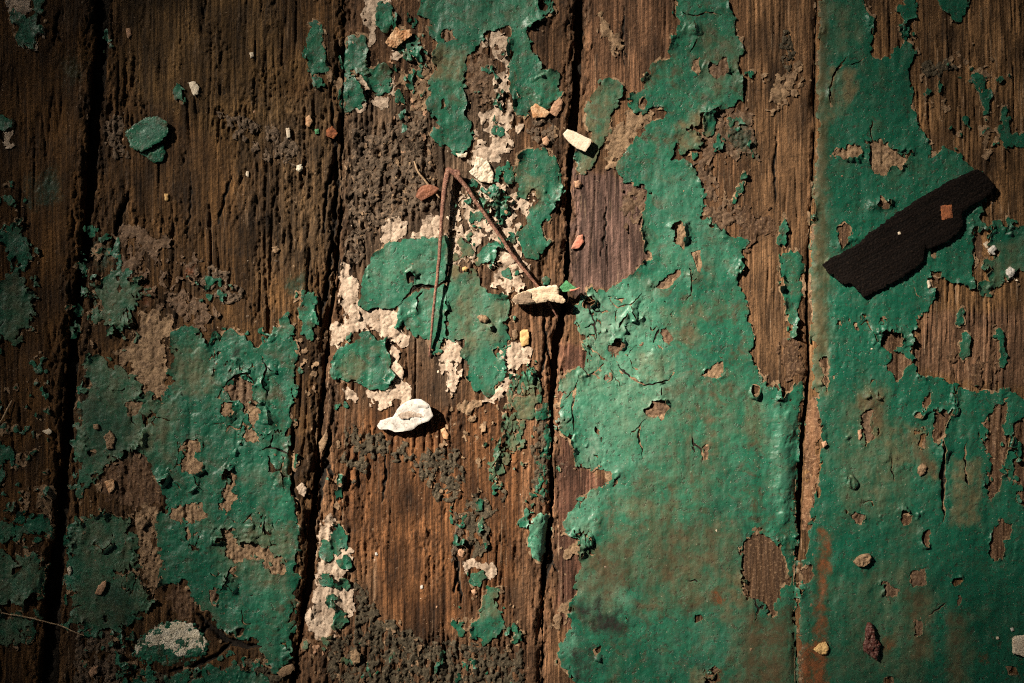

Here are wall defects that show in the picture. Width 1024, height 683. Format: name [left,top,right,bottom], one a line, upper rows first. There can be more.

crack [319,82,341,325]
peeling [0,181,40,354]
crack [540,317,550,376]
crack [566,380,578,430]
crack [584,292,659,343]
crack [618,364,672,396]
peeling [302,0,1024,683]
peeling [0,225,526,683]
crack [260,425,334,517]
crack [541,543,558,601]